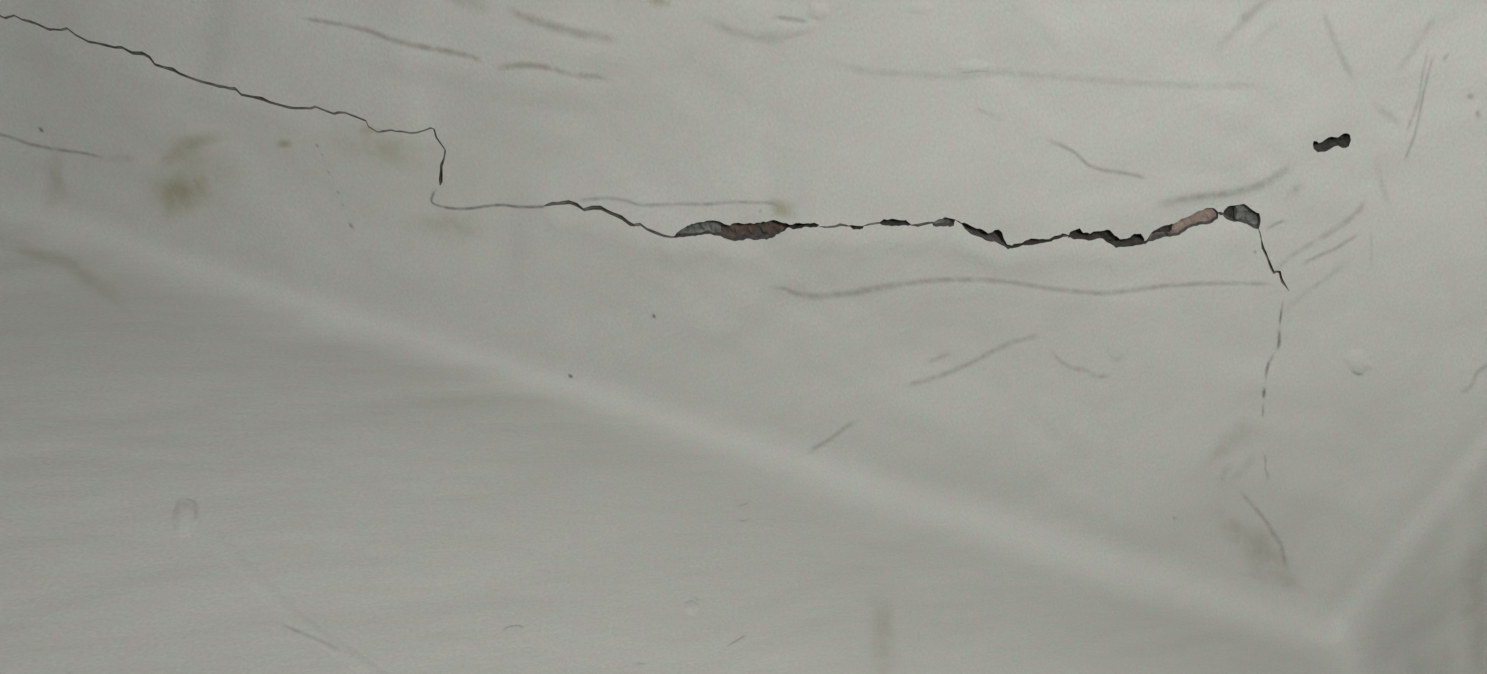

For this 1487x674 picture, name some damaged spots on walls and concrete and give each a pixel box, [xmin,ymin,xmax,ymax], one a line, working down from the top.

crack [0,14,446,203]
crack [508,200,1289,291]